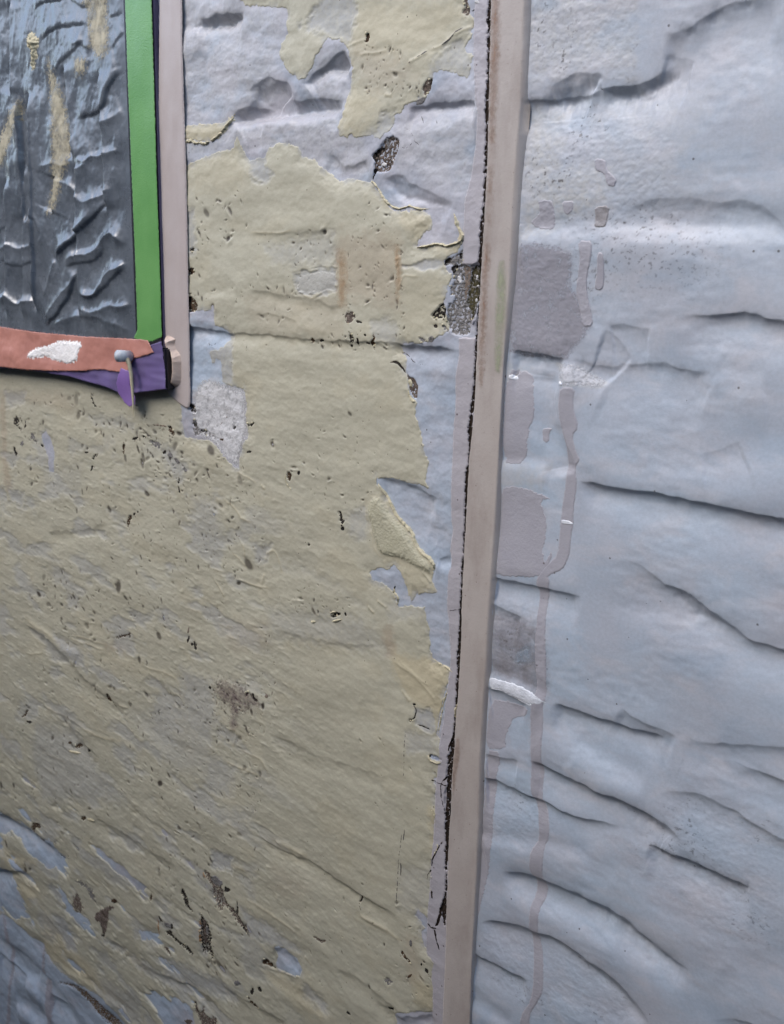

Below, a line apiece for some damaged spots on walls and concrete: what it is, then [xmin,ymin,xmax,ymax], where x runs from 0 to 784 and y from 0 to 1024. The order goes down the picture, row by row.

spalling [416,78,433,105]
peeling [186,114,236,146]
crack [409,0,491,266]
spalling [371,136,427,211]
spalling [188,294,198,312]
spalling [345,311,376,347]
spalling [417,214,481,343]
spalling [390,361,418,403]
peeling [189,379,254,464]
crack [427,306,479,949]
spalling [72,878,117,937]
spalling [60,982,122,1024]